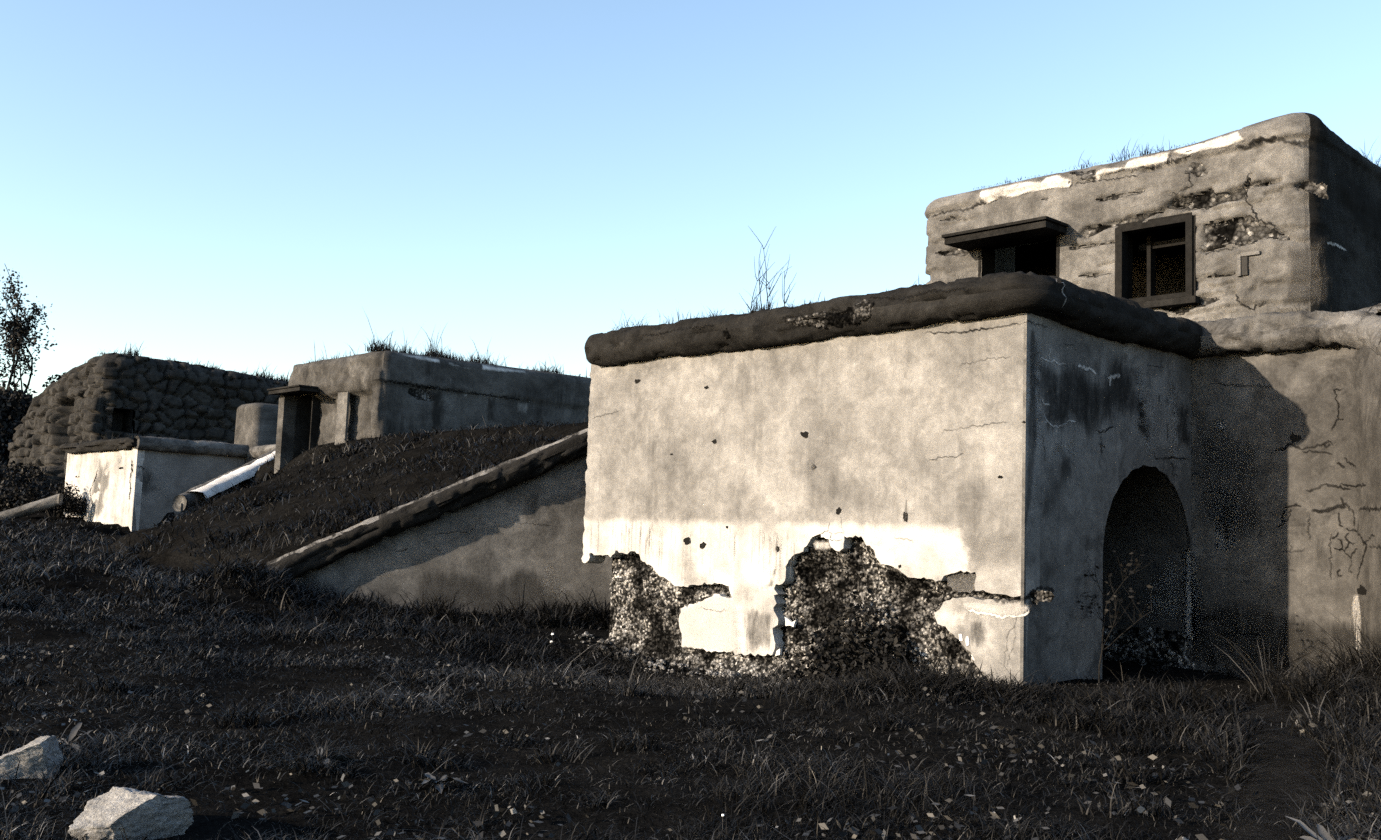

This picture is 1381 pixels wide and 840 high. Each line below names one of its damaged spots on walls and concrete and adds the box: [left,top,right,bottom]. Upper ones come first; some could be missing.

damp [1030,332,1188,464]
crack [1276,388,1381,584]
spalling [605,537,1055,682]